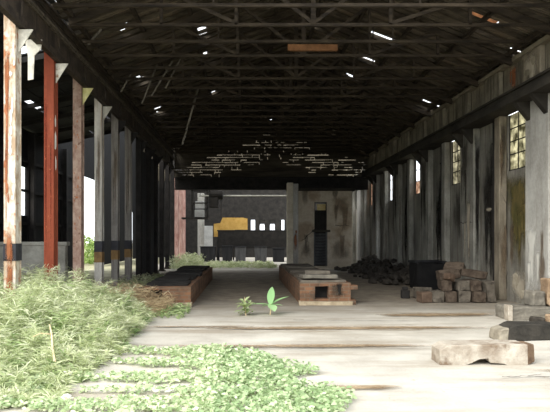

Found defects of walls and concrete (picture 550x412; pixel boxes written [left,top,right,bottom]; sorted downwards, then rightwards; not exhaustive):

leakage [456,147,493,260]
leakage [501,202,544,285]